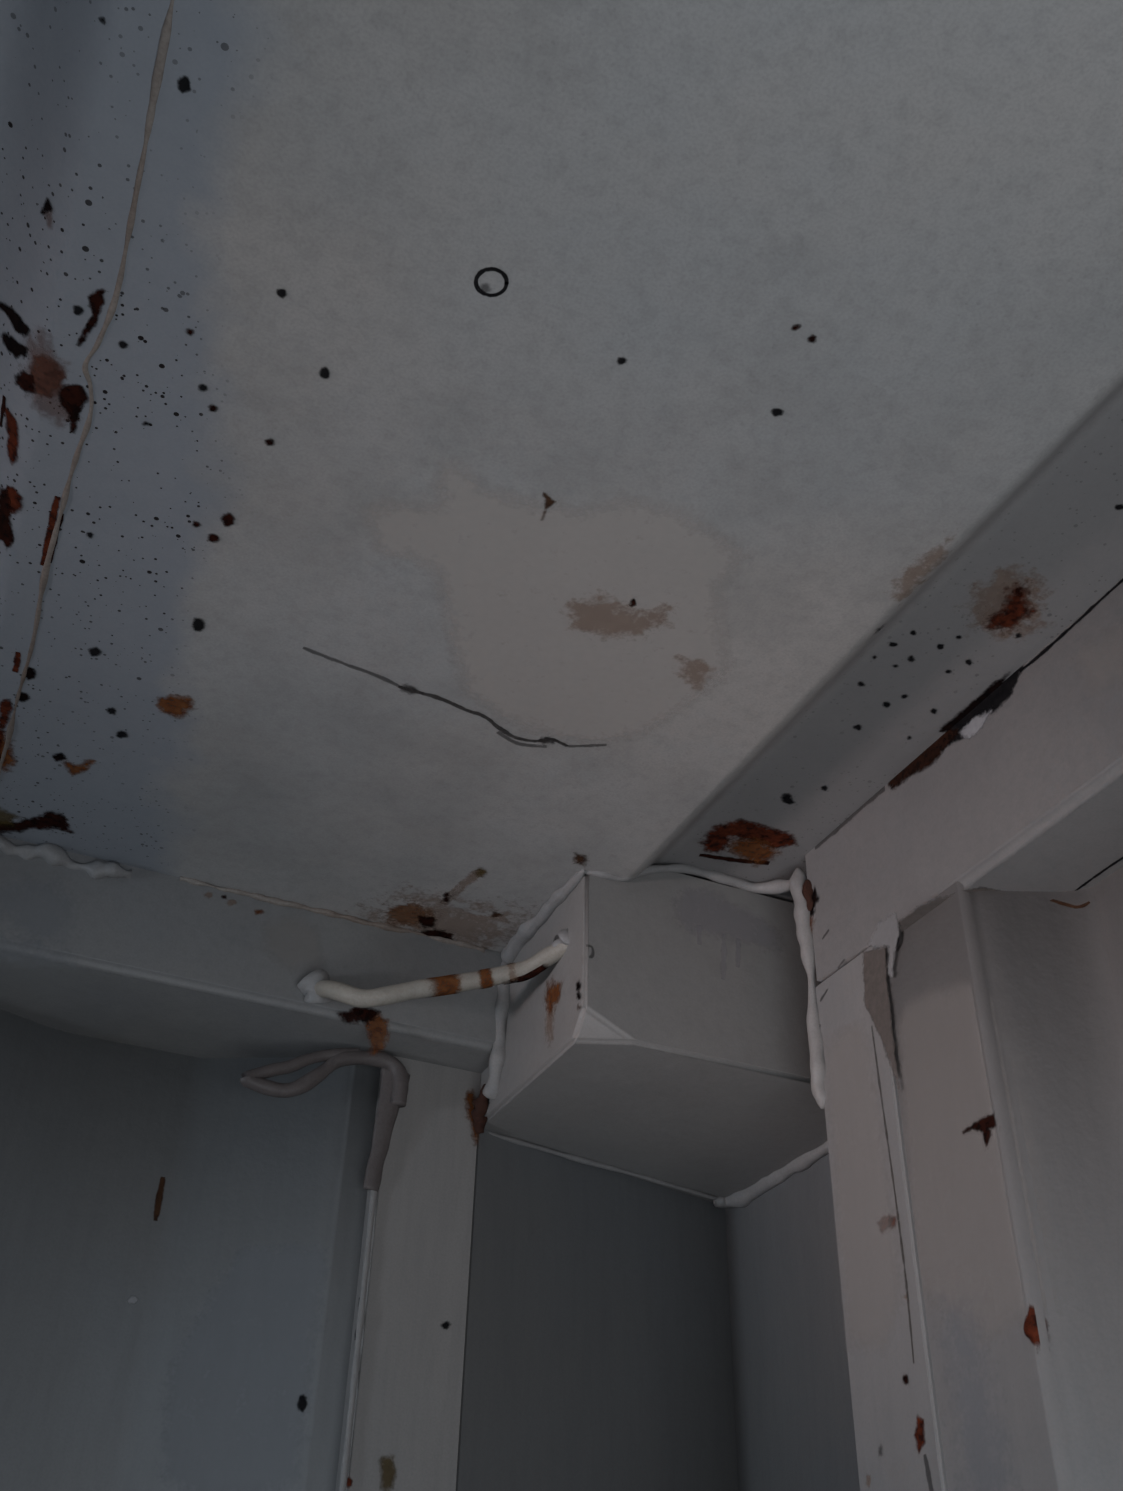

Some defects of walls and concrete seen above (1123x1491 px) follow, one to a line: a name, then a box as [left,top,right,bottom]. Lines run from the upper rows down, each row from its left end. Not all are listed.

corrosion [77,289,105,346]
corrosion [0,302,88,463]
corrosion [0,486,22,547]
corrosion [40,496,64,566]
corrosion [987,583,1035,630]
corrosion [0,652,36,771]
crack [398,685,568,747]
peeling [888,666,1023,789]
corrosion [0,811,73,833]
corrosion [699,819,795,865]
corrosion [963,1114,995,1145]
corrosion [1024,1306,1047,1345]